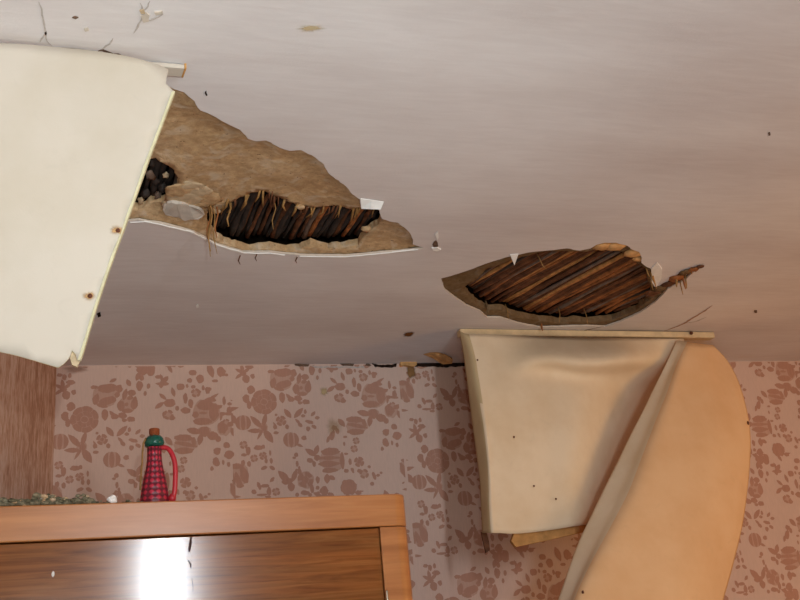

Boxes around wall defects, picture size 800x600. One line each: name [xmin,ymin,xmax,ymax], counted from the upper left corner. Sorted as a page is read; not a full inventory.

crack [39,3,121,55]
crack [134,1,163,33]
flaking render [129,87,419,265]
flaking render [441,243,704,331]
crack [295,352,465,368]